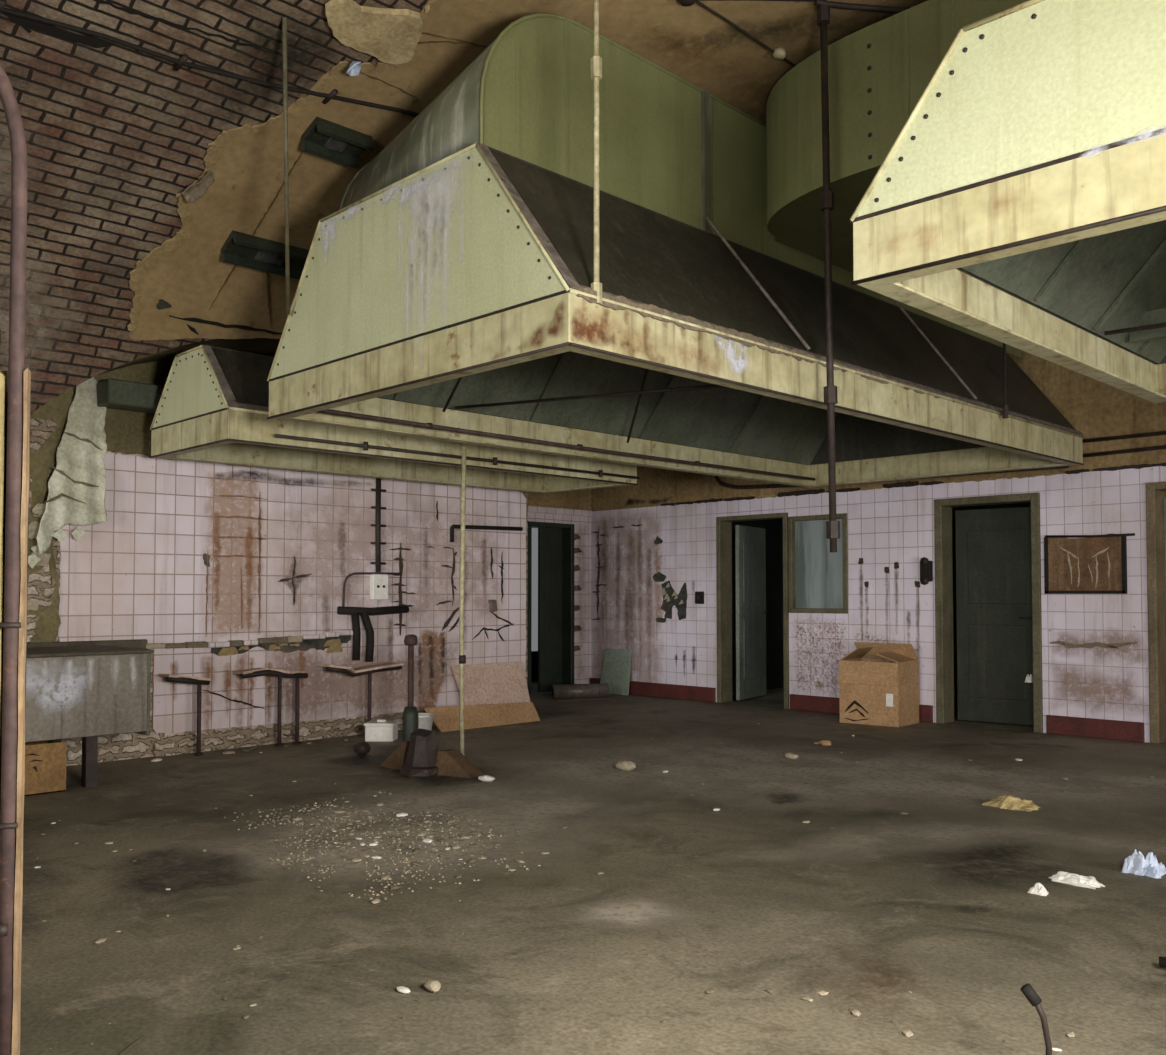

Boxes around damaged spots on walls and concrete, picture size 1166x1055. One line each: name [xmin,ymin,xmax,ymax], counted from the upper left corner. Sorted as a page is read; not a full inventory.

flaking render [127,0,436,332]
leakage [398,171,462,330]
corrosion [533,306,608,344]
peeling [27,377,107,643]
corrosion [206,479,268,635]
leakage [580,517,658,682]